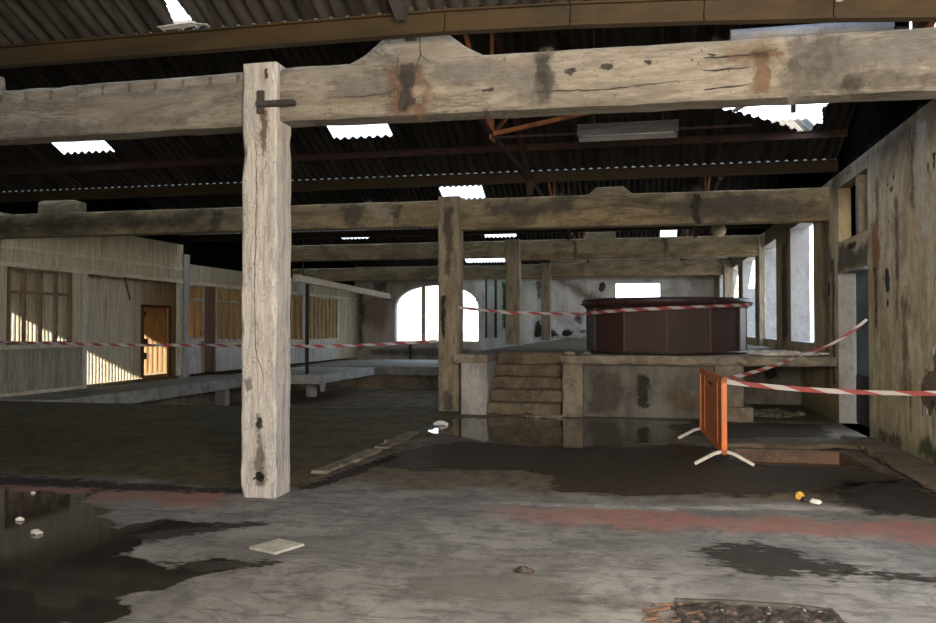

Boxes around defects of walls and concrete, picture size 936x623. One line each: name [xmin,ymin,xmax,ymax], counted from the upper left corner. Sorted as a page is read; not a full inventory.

rust [732,47,781,93]
water stain [890,121,927,234]
water stain [896,298,911,403]
peeling [917,347,936,426]
water stain [919,437,936,464]
water stain [691,539,936,584]